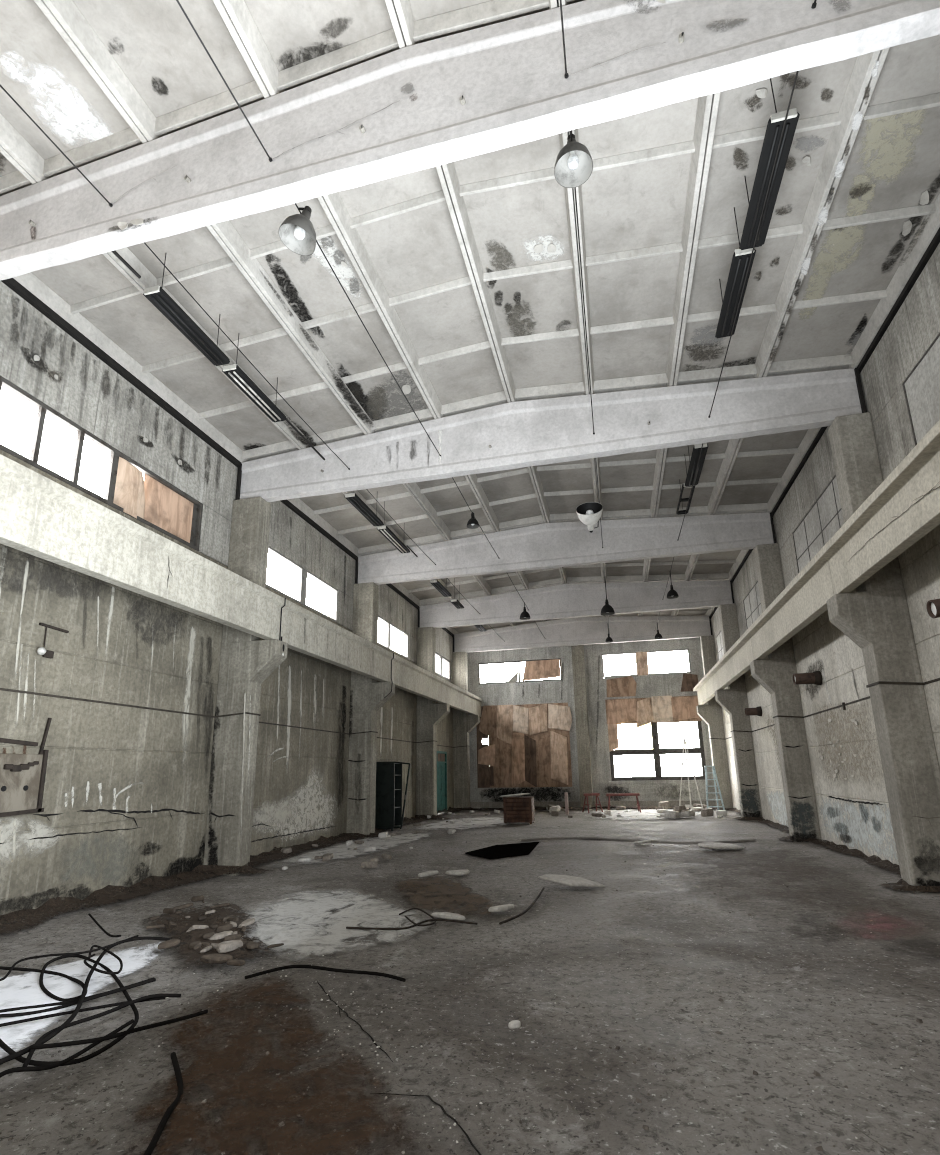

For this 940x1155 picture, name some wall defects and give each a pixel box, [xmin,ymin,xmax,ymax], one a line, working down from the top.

peeling [706,19,747,31]
peeling [487,242,514,282]
peeling [524,235,564,262]
spalling [882,175,940,271]
leakage [12,298,27,342]
leakage [32,330,119,395]
leakage [154,409,184,464]
leakage [0,546,115,722]
leakage [702,789,940,956]